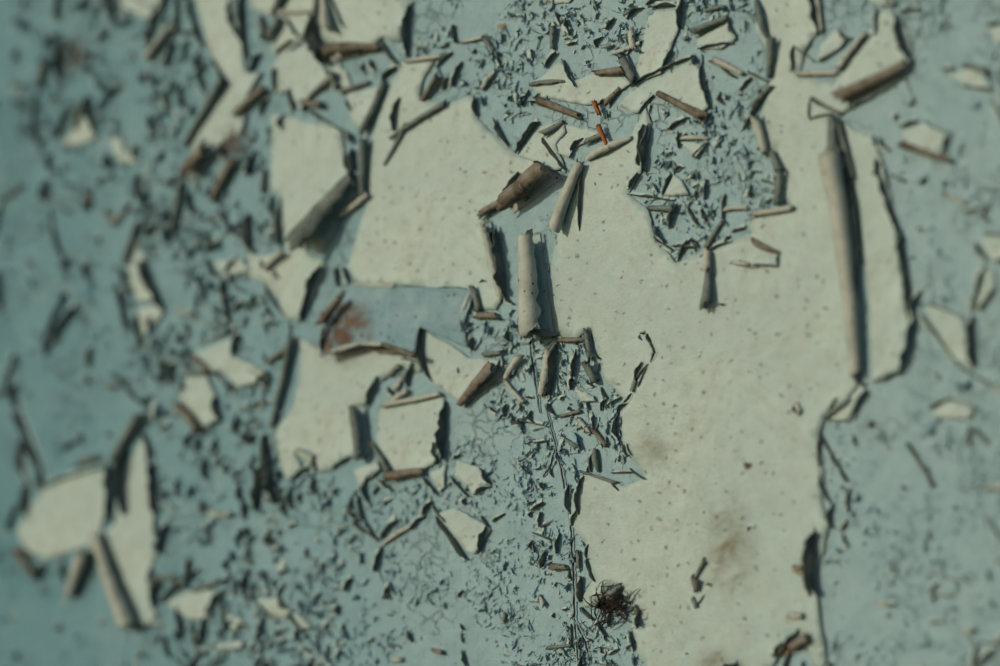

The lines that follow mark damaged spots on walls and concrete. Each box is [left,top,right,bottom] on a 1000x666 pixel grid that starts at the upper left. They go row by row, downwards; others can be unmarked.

peeling [934,21,1000,148]
peeling [890,113,968,164]
peeling [30,152,99,276]
peeling [35,286,83,356]
peeling [905,442,940,503]
peeling [185,500,234,552]
peeling [849,528,1000,666]
peeling [377,616,414,666]
peeling [459,624,467,666]